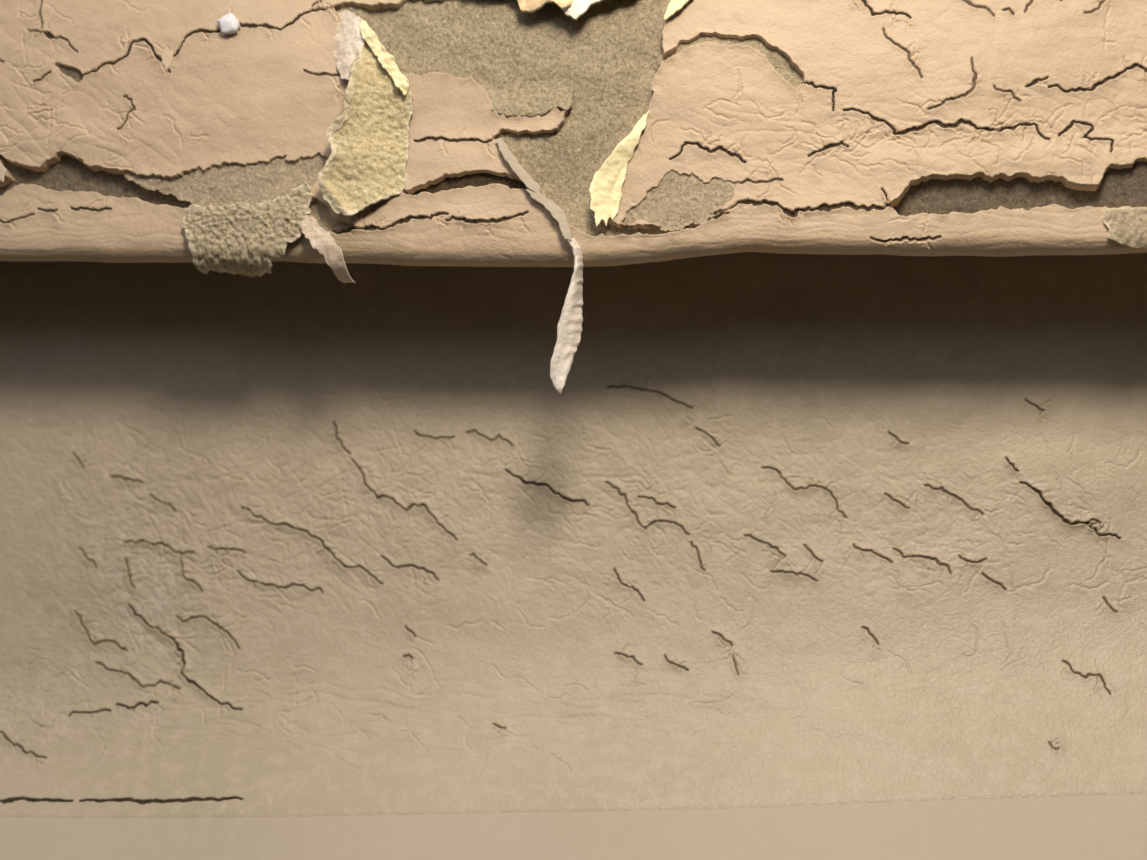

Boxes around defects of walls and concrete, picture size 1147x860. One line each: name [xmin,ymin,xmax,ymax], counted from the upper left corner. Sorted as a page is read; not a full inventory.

crack [28,0,341,78]
crack [861,0,923,78]
crack [843,58,1147,152]
peeling [0,0,740,393]
crack [670,141,941,243]
peeling [893,161,1147,249]
crack [241,507,439,585]
crack [414,429,589,506]
crack [606,482,705,571]
crack [853,545,1006,590]
crack [1006,458,1121,539]
crack [69,540,323,716]